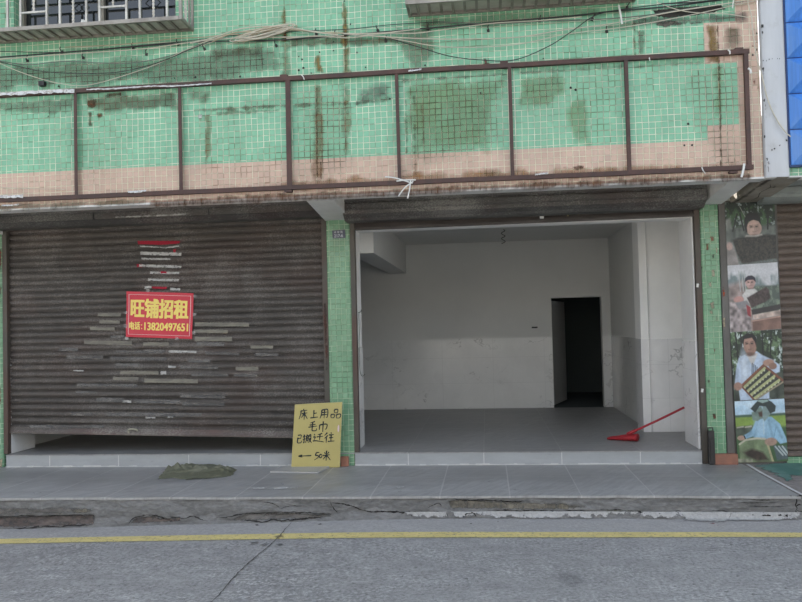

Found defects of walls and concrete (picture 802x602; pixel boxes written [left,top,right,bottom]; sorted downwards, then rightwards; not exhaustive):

rust [341,6,349,72]
rust [708,27,721,94]
damp [410,85,480,160]
rust [153,106,750,207]
spalling [0,507,95,529]
spalling [129,515,206,523]
spalling [217,511,331,523]
spalling [449,499,583,512]